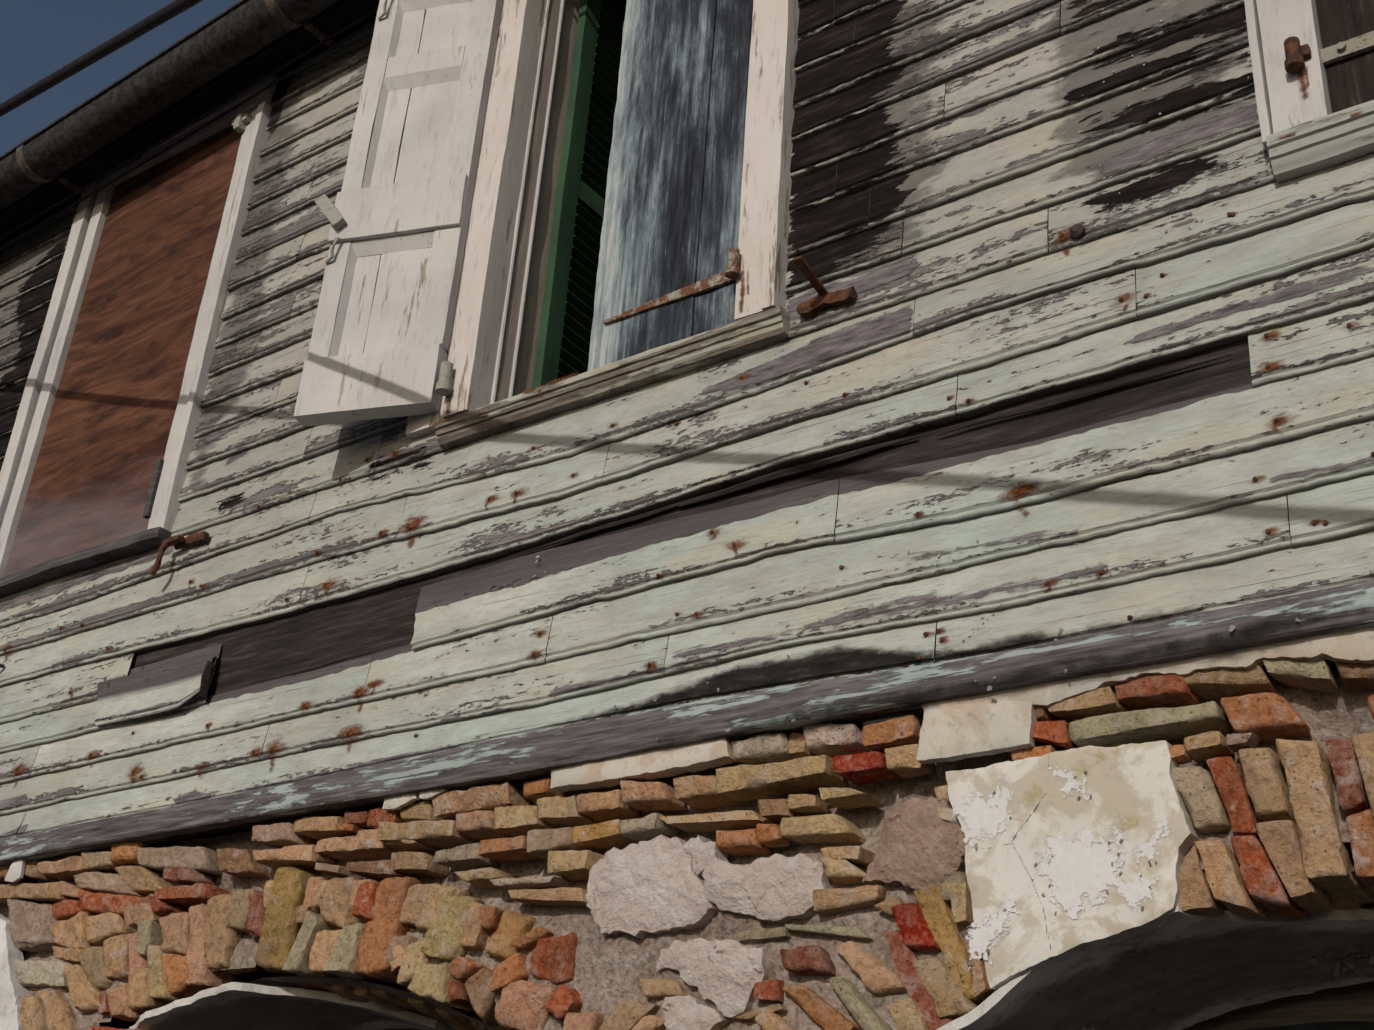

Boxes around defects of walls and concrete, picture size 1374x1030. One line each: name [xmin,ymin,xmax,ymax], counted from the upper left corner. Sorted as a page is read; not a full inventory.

peeling [1062,0,1259,216]
rust [1298,66,1309,98]
peeling [785,0,921,323]
peeling [1129,266,1374,343]
peeling [0,223,71,471]
rust [1271,417,1288,433]
rust [485,489,525,510]
rust [1003,482,1038,515]
peeling [0,546,174,612]
rust [526,630,545,659]
rust [337,680,384,751]
peeling [964,895,1020,970]